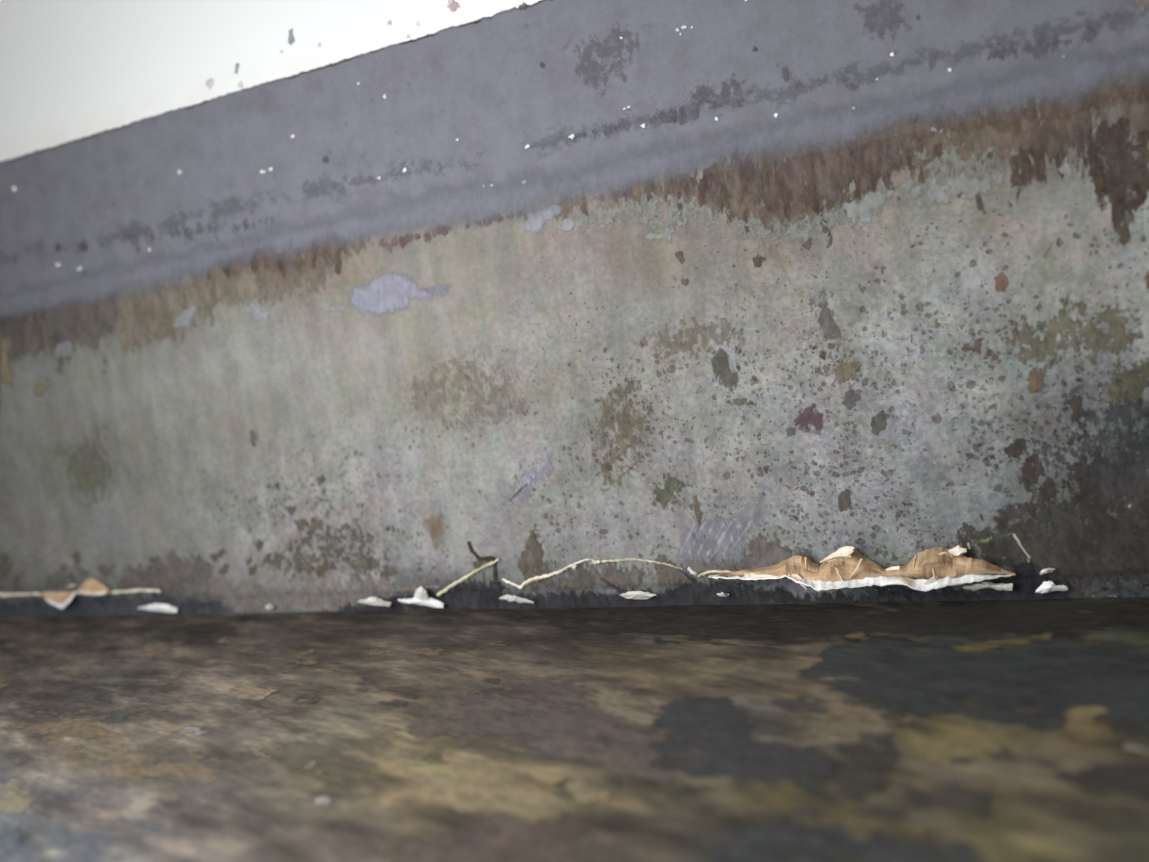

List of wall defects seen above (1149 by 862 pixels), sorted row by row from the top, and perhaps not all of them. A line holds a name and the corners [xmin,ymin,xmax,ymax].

corrosion [555,72,1149,249]
damp [955,394,1149,593]
peeling [0,578,178,613]
peeling [398,559,499,608]
peeling [499,545,1016,603]